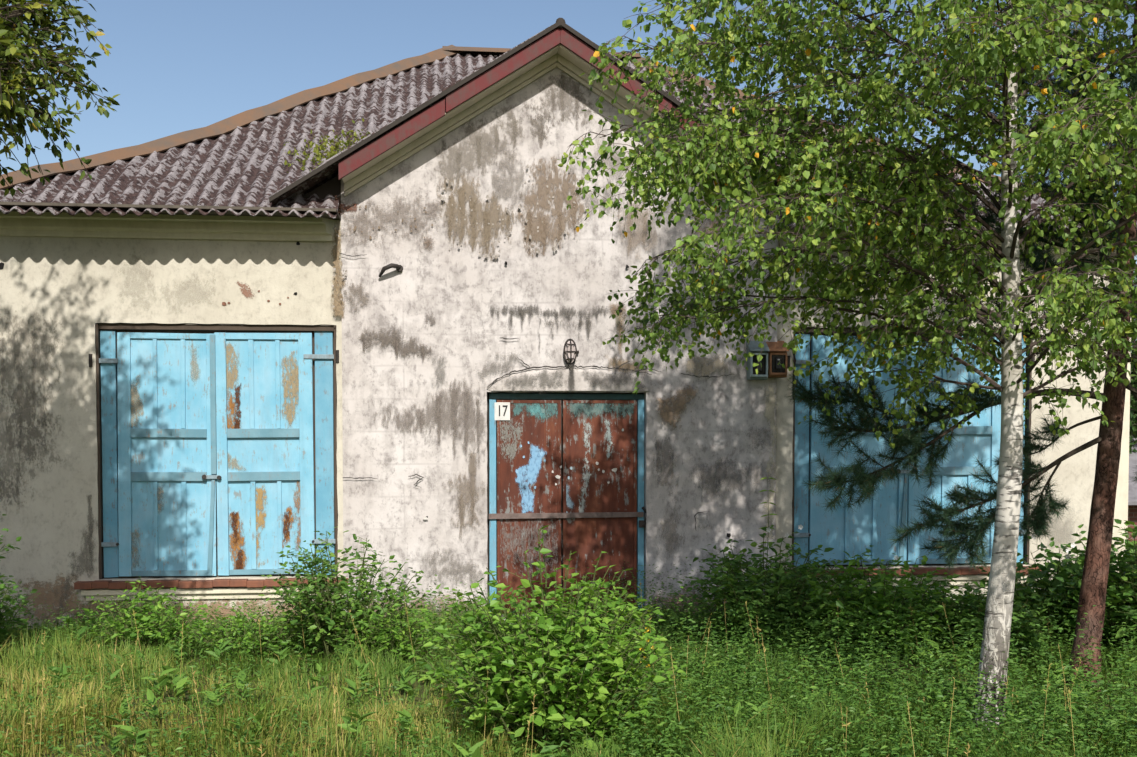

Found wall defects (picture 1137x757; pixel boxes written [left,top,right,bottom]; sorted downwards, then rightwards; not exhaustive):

damp [434,76,592,206]
damp [341,196,441,249]
peeling [237,282,297,305]
damp [490,305,608,353]
corrosion [226,344,241,429]
corrosion [281,352,299,426]
corrosion [229,486,266,570]
corrosion [282,482,301,550]
damp [358,326,645,538]
peeling [500,399,634,513]
damp [692,459,766,500]